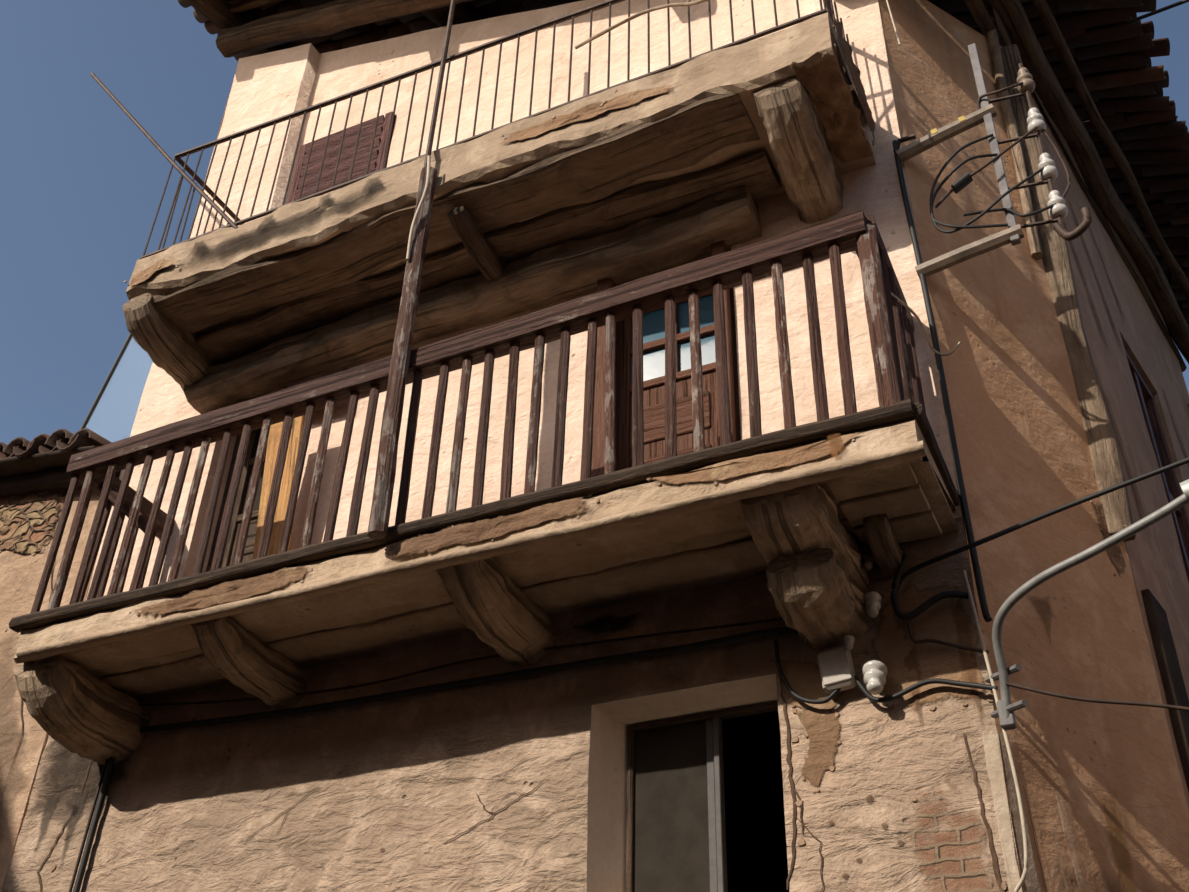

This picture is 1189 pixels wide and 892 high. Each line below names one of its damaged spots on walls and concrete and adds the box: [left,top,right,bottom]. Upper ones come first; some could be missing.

water stain [364,178,383,192]
water stain [189,241,206,256]
spalling [768,657,844,793]
water stain [36,741,125,853]
crack [443,779,548,844]
crack [778,672,824,892]
flaking render [897,733,1047,892]